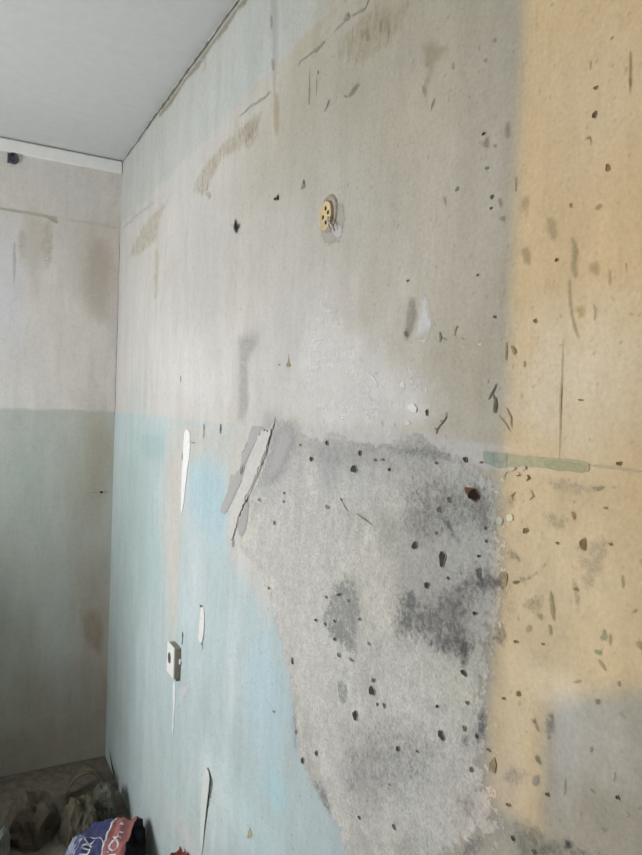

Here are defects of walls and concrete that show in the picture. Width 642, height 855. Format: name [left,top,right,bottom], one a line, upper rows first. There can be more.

peeling [181,429,195,513]
spalling [220,404,545,855]
water stain [394,570,503,665]
peeling [200,768,212,855]